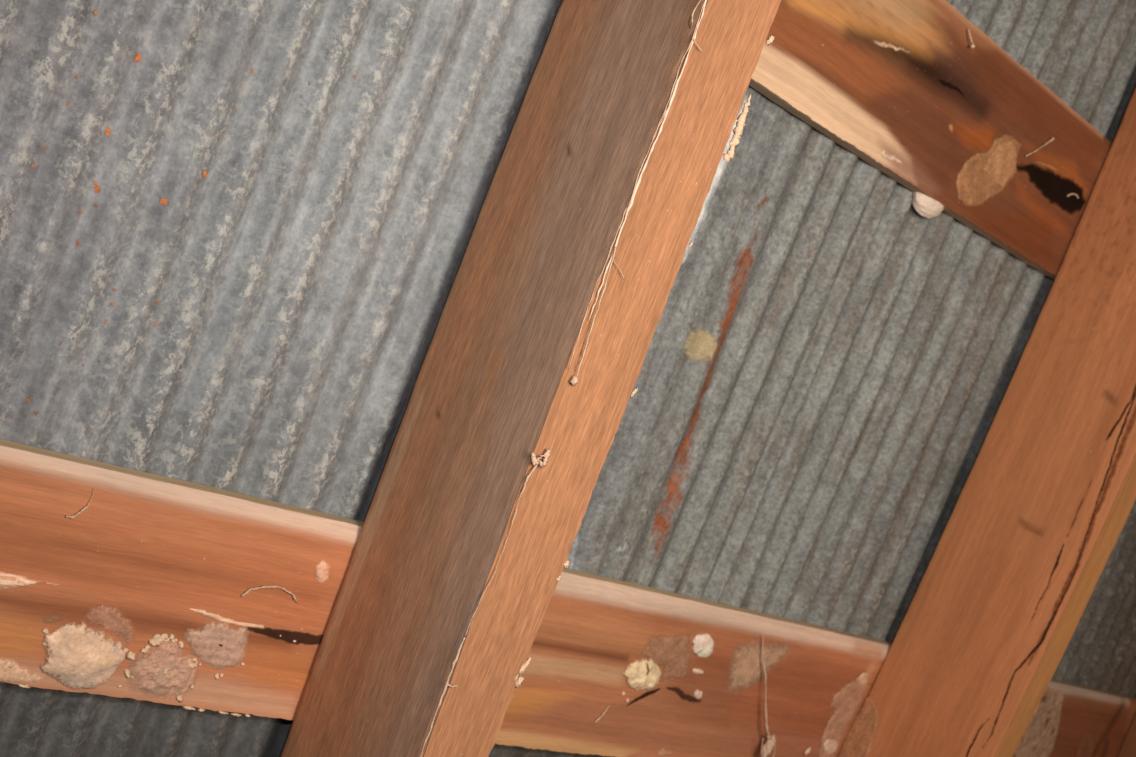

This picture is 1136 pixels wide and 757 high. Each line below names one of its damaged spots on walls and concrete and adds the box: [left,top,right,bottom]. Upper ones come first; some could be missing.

rust [654,248,753,550]
crack [966,386,1136,757]